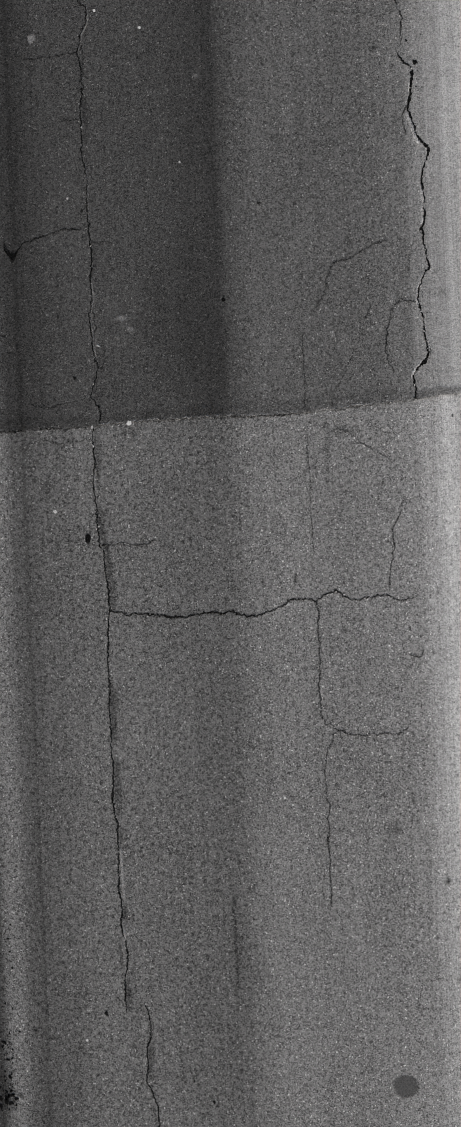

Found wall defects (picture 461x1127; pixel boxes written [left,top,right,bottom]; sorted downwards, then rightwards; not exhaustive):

crack [4,0,414,1012]
crack [144,1003,161,1127]